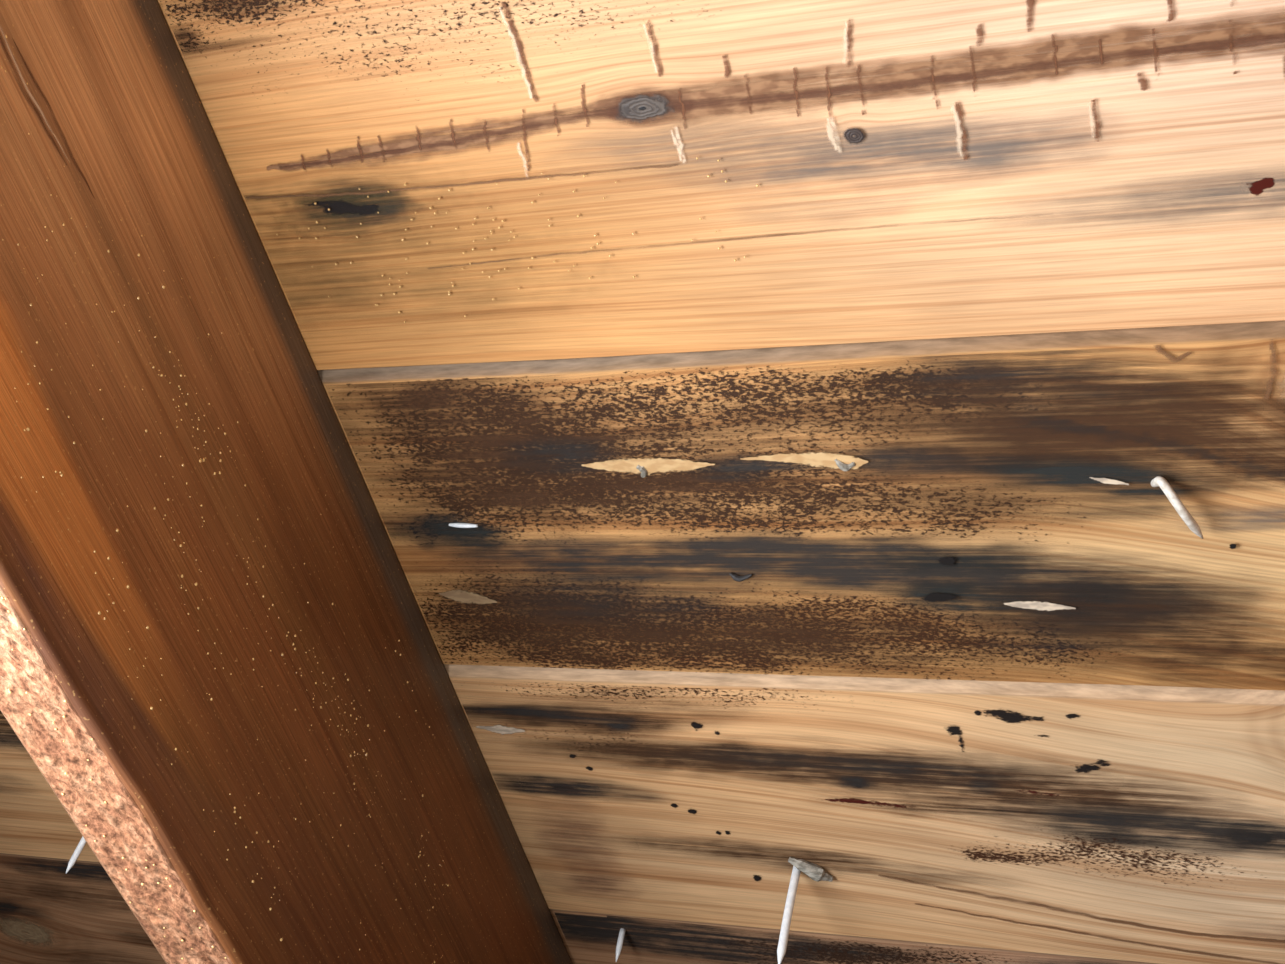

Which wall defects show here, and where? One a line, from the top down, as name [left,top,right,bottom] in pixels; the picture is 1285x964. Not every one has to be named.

mould [161,0,632,82]
crack [0,38,96,200]
water stain [770,129,1054,178]
water stain [257,186,405,235]
water stain [332,352,1285,887]
water stain [555,913,1011,964]